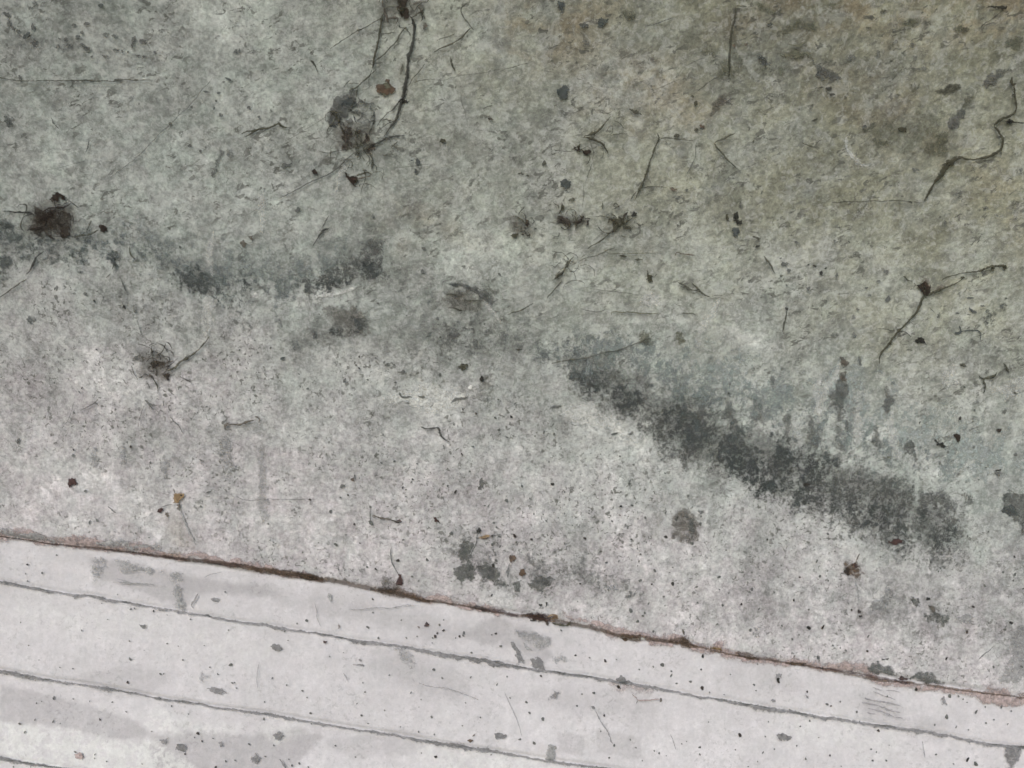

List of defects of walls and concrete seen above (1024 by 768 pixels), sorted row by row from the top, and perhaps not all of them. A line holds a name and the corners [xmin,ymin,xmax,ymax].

crack [833,78,1023,203]
crack [878,264,1007,364]
water stain [541,337,1024,569]